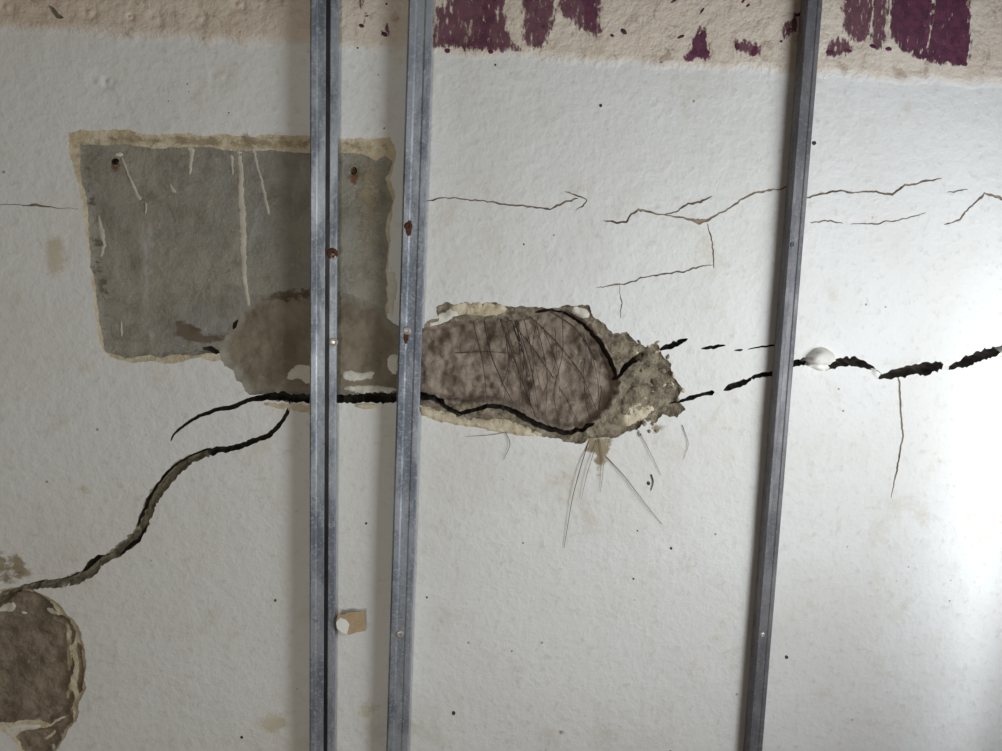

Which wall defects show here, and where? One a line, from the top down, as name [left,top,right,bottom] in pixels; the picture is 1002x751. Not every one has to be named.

spalling [68,129,310,415]
spalling [337,137,399,409]
crack [337,392,595,435]
crack [427,191,587,210]
spalling [420,302,688,546]
crack [535,308,774,380]
crack [597,178,1002,318]
crack [669,345,1002,497]
spalling [0,587,87,751]